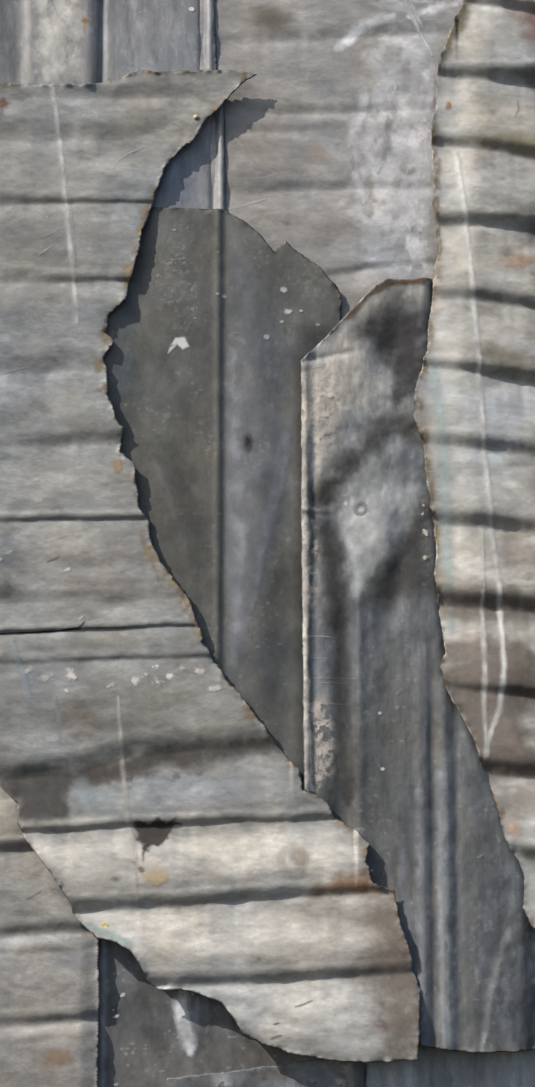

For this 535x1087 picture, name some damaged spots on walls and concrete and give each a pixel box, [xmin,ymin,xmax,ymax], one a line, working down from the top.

damp [366,307,420,400]
damp [309,423,417,507]
peeling [302,361,339,791]
damp [370,517,426,599]
peeling [131,665,204,685]
damp [316,522,351,805]
peeling [134,817,182,854]
damp [423,763,453,919]